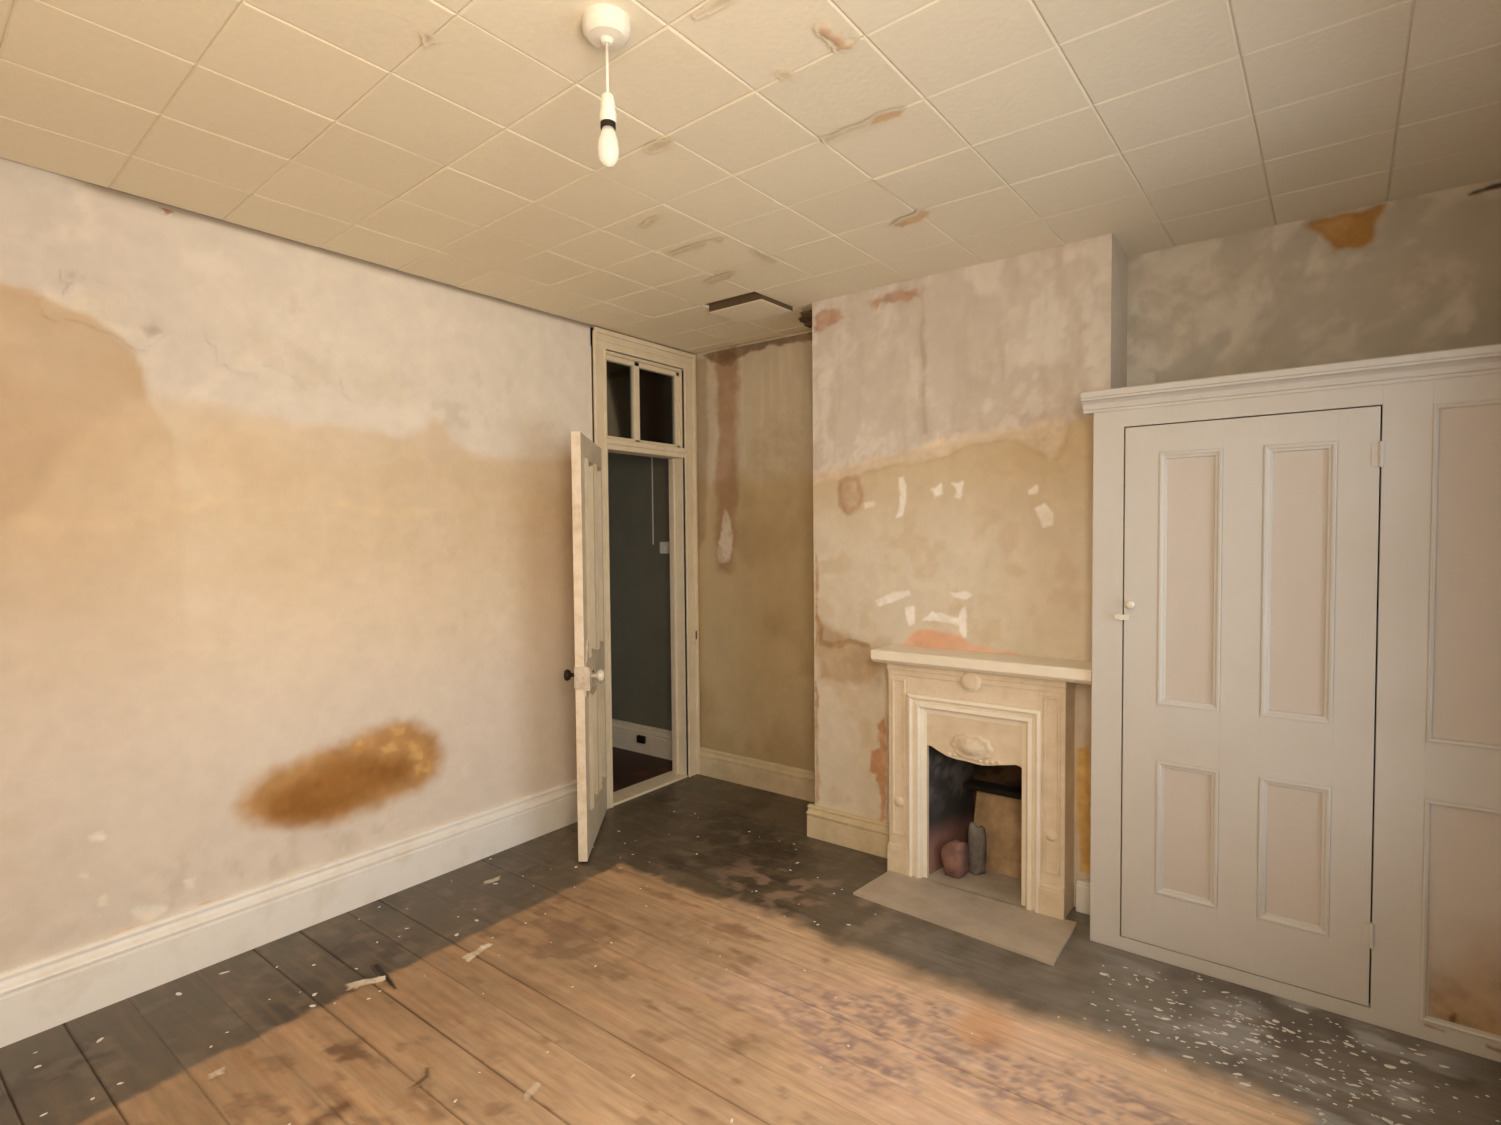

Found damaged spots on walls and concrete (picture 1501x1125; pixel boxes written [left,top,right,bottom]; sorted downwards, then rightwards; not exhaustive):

peeling [814,22,861,54]
peeling [820,106,910,145]
flaking render [865,285,922,313]
flaking render [800,306,846,336]
flaking render [874,589,1030,656]
peeling [868,715,888,822]